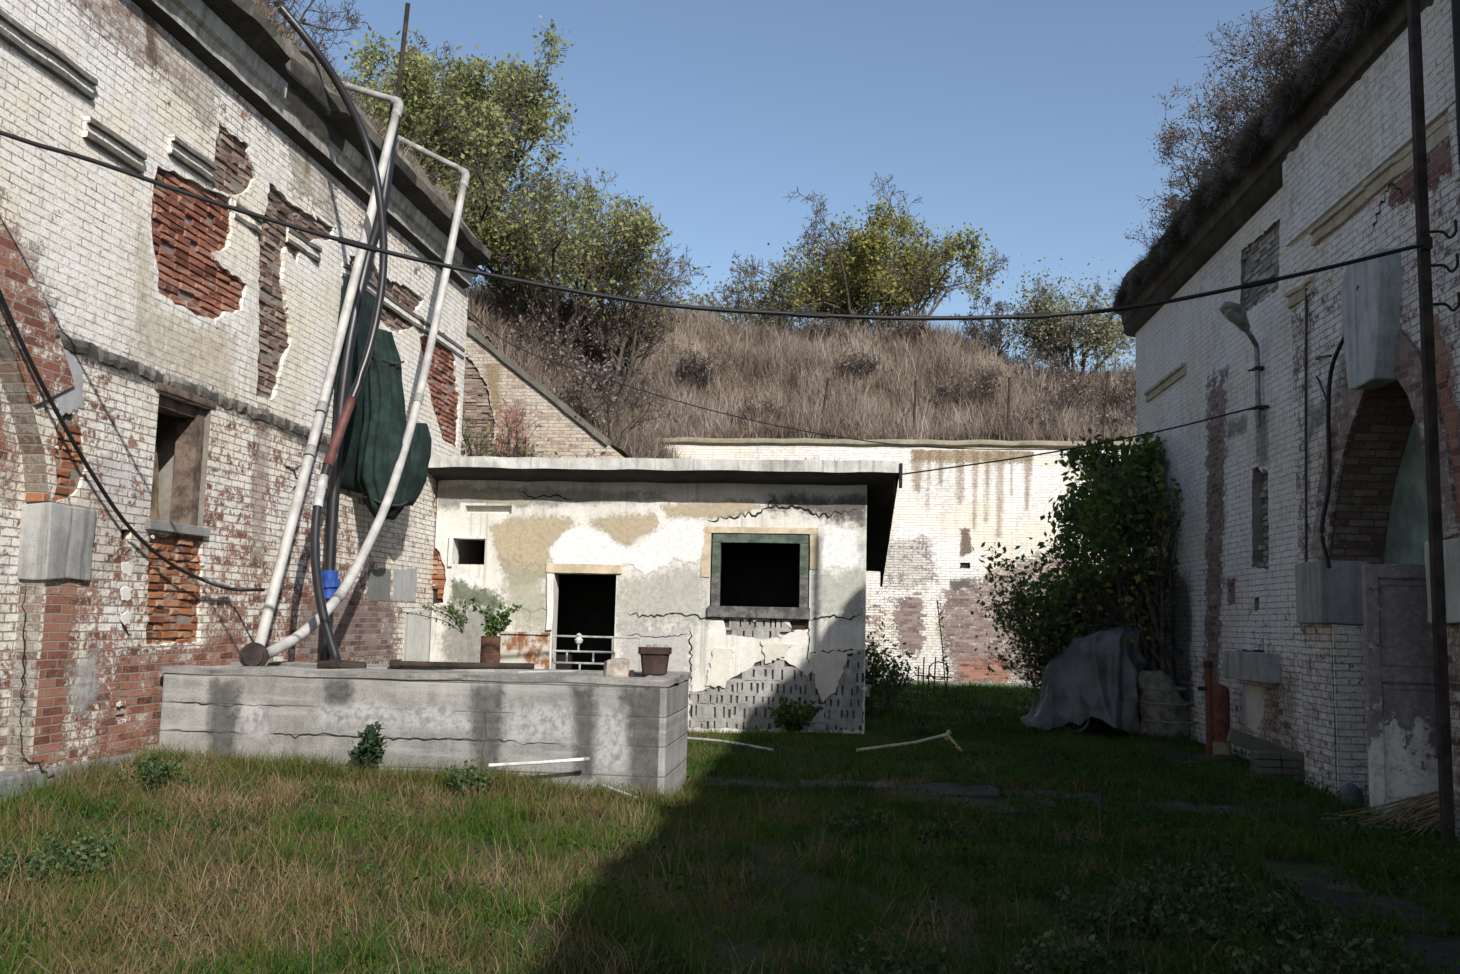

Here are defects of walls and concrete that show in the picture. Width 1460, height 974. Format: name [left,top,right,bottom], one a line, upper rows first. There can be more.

peeling [1388,136,1452,210]
peeling [0,186,65,334]
flaking render [63,0,343,570]
flaking render [369,267,536,457]
flaking render [0,382,245,766]
peeling [480,490,760,630]
crack [708,500,857,522]
peeling [1201,365,1236,708]
flaking render [1250,468,1269,567]
damp [210,685,271,761]